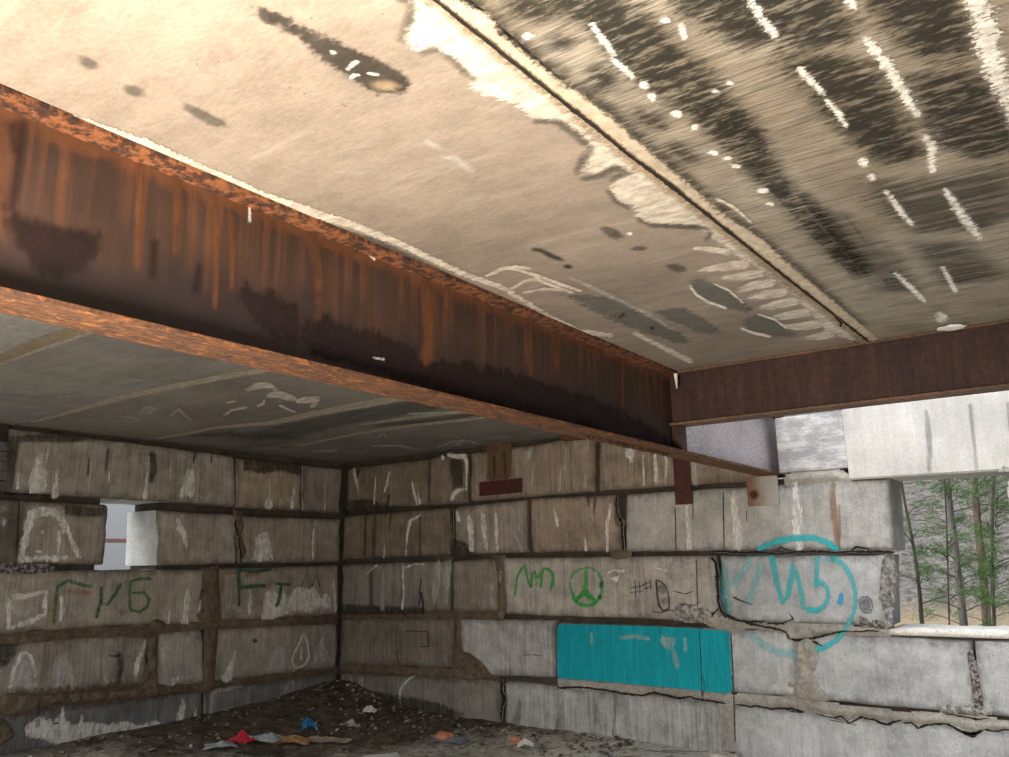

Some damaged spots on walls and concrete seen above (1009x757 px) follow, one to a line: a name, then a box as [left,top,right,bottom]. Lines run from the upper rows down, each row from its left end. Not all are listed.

damp [258,7,409,93]
damp [400,0,1009,343]
damp [10,215,101,276]
spalling [451,619,500,681]
crack [557,487,1009,742]